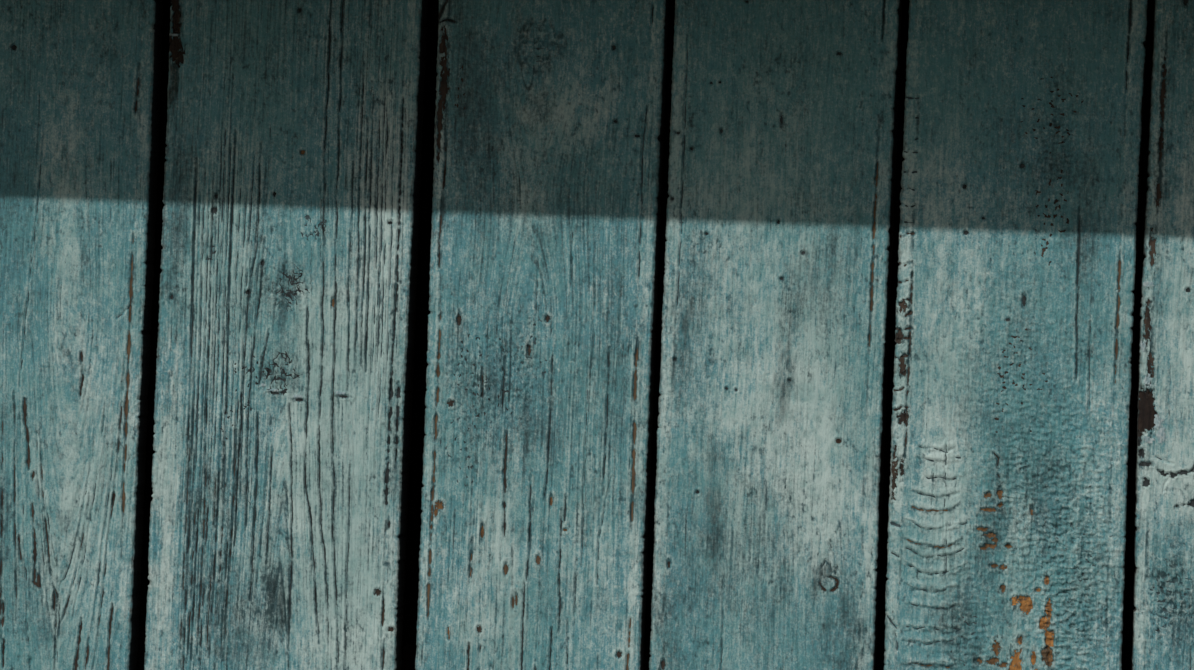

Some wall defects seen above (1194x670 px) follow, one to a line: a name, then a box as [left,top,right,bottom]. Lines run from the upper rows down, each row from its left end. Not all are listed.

crack [869,97,967,668]
peeling [981,490,1003,512]
peeling [977,527,1012,550]
peeling [950,575,1054,670]